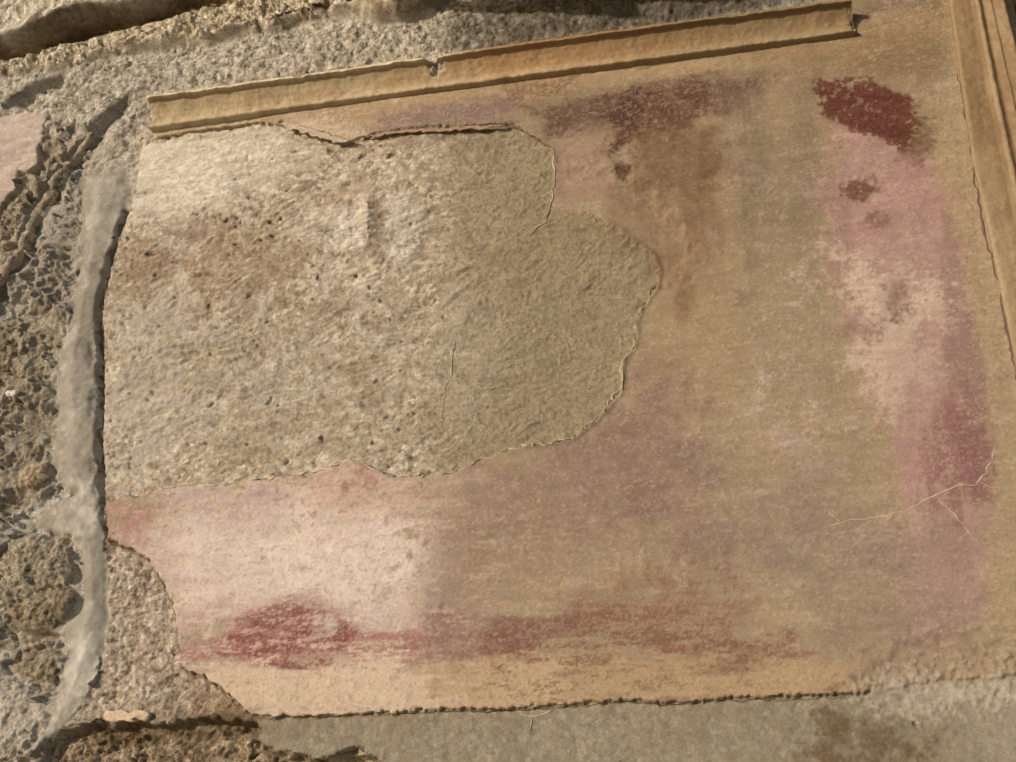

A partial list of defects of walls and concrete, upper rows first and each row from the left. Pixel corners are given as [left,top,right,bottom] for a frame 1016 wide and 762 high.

spalling [48,121,659,762]